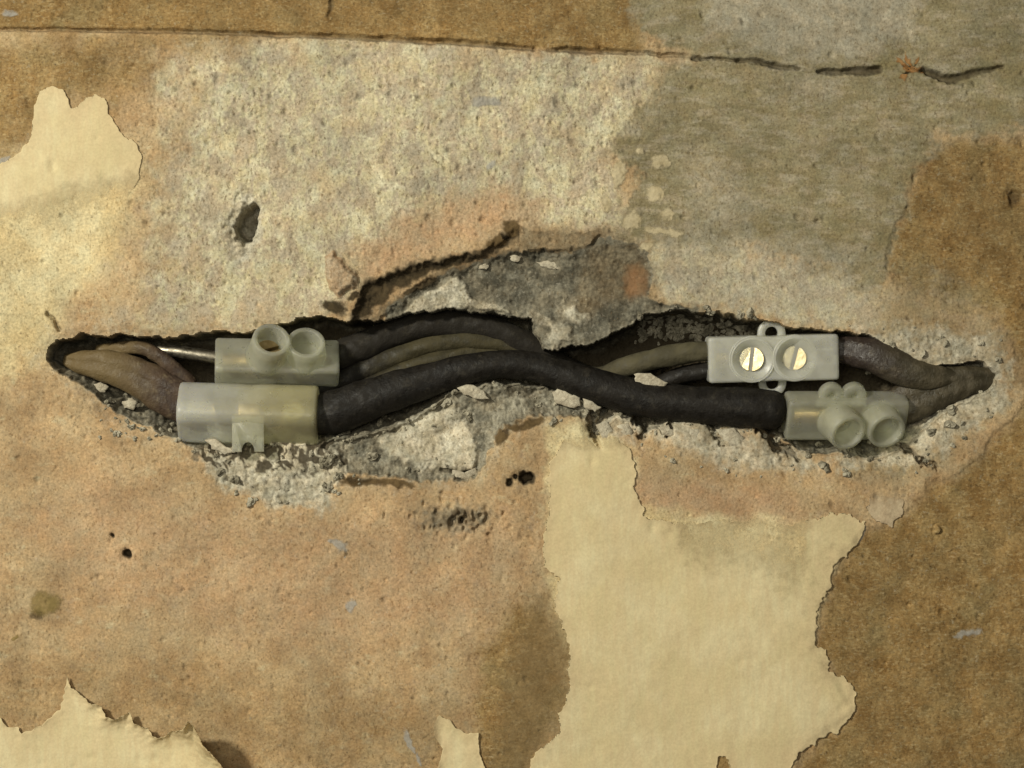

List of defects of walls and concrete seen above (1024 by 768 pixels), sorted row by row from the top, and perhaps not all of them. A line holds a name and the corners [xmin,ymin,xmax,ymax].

crack [0,0,884,76]
crack [920,65,1005,84]
peeling [0,86,142,214]
peeling [636,148,671,169]
peeling [46,186,1020,768]
peeling [0,678,222,768]